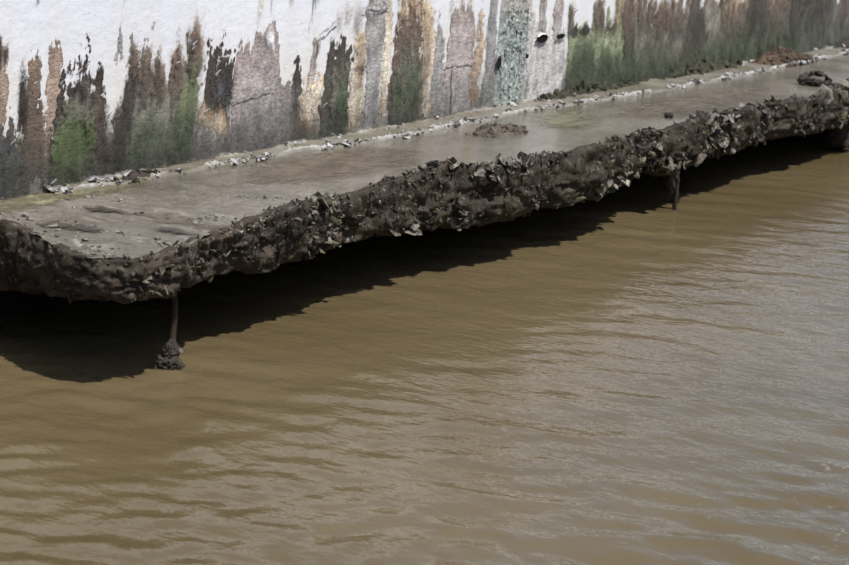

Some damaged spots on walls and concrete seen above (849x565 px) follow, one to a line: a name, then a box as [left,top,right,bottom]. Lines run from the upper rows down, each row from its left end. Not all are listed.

peeling [0,16,324,200]
damp [7,0,498,194]
peeling [303,191,353,261]
flaking render [340,6,367,131]
peeling [379,0,438,125]
peeling [385,192,469,236]
peeling [469,151,549,211]
damp [523,0,566,100]
peeling [564,103,746,210]
peeling [630,0,849,81]
peeling [815,77,849,129]
spalling [142,253,186,370]